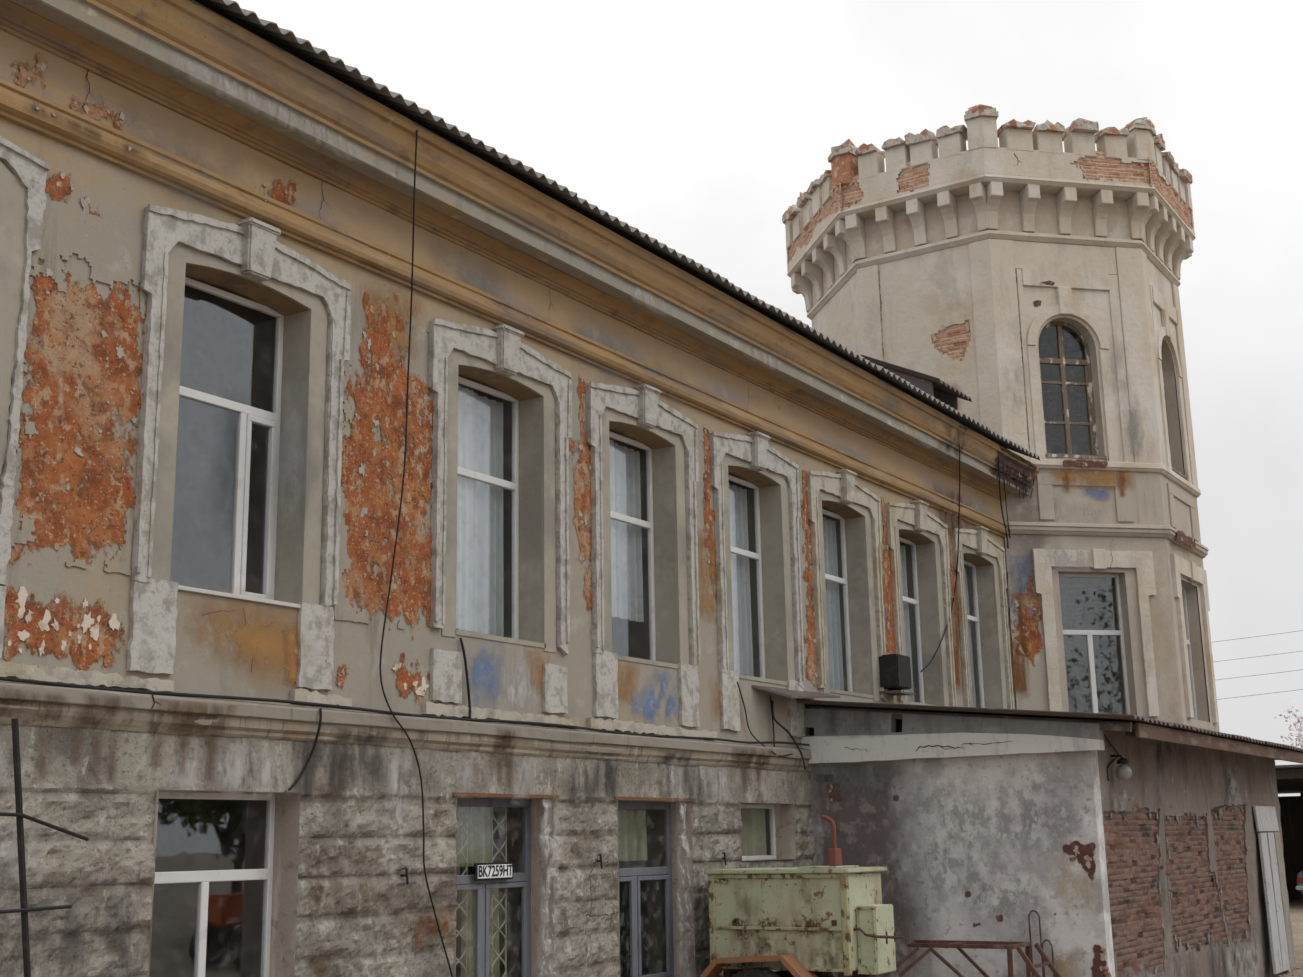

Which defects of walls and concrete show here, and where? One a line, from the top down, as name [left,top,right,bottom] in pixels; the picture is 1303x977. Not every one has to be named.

spalling [1070,151,1193,229]
peeling [7,258,147,565]
peeling [331,290,434,639]
peeling [569,375,593,612]
corrosion [1056,469,1130,495]
peeling [800,470,818,689]
peeling [3,586,126,671]
corrosion [1011,597,1026,691]
damp [0,694,28,713]
damp [153,703,274,788]
damp [389,755,407,831]
spalling [1063,799,1251,977]